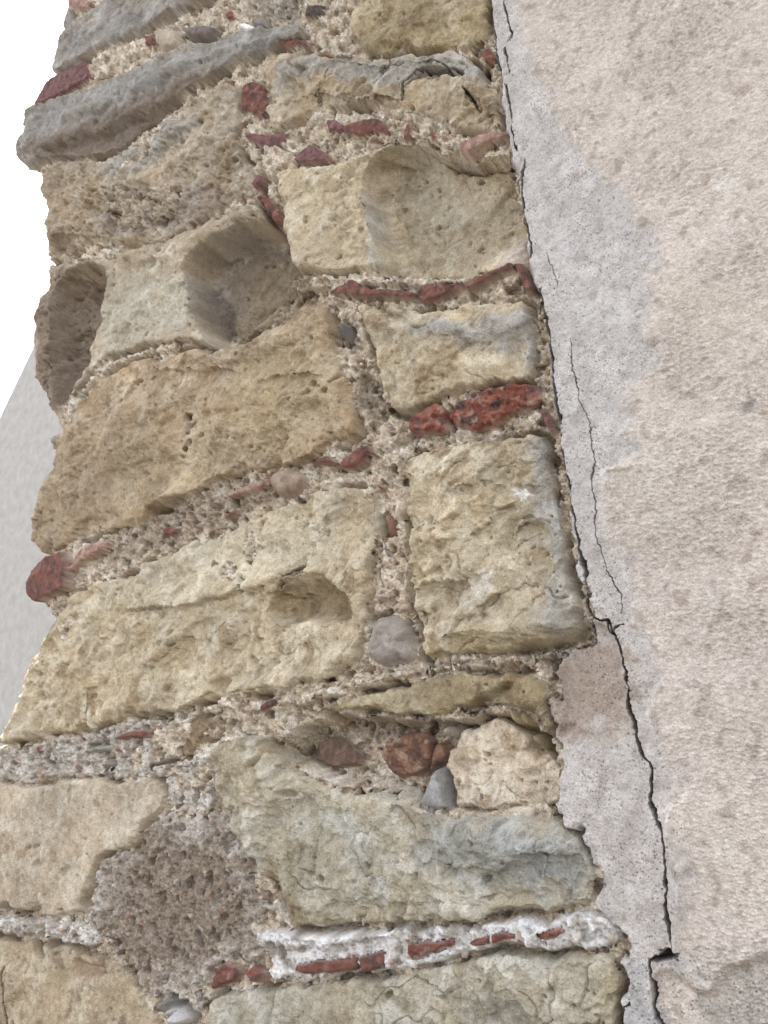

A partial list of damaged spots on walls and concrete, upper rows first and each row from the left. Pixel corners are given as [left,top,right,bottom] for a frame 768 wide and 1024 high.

crack [492,2,679,1024]